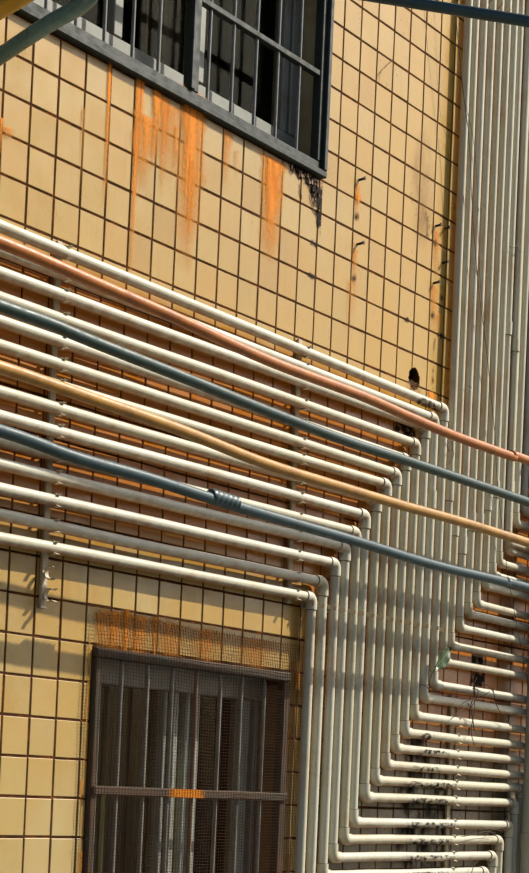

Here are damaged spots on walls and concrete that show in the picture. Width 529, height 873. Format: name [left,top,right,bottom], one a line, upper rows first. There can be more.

rust [132,78,205,226]
rust [262,154,285,240]